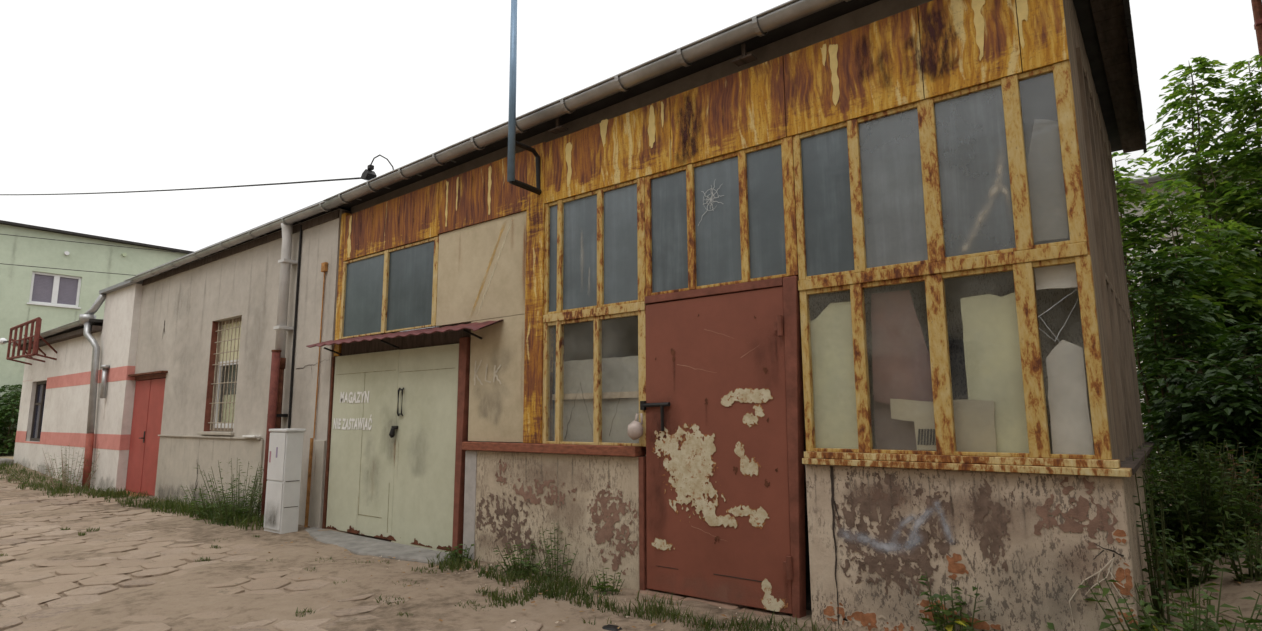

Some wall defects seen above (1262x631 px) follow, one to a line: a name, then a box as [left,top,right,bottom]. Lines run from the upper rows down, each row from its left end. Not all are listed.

corrosion [908,11,956,77]
corrosion [677,96,699,161]
peeling [721,388,773,428]
peeling [476,459,675,575]
peeling [652,423,770,529]
peeling [761,578,788,612]
peeling [823,472,1014,631]
peeling [1034,477,1138,631]